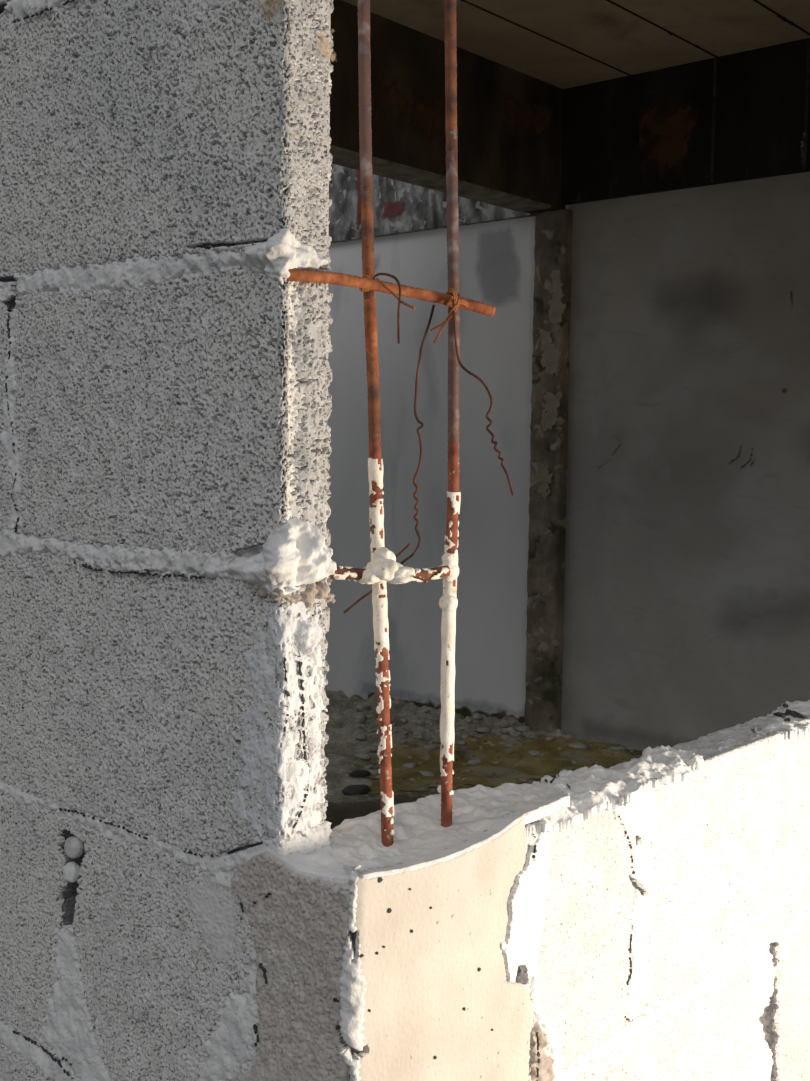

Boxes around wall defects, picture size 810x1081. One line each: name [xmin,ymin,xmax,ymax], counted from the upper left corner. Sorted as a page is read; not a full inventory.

leakage [479,230,517,300]
peeling [536,268,566,379]
peeling [540,391,561,432]